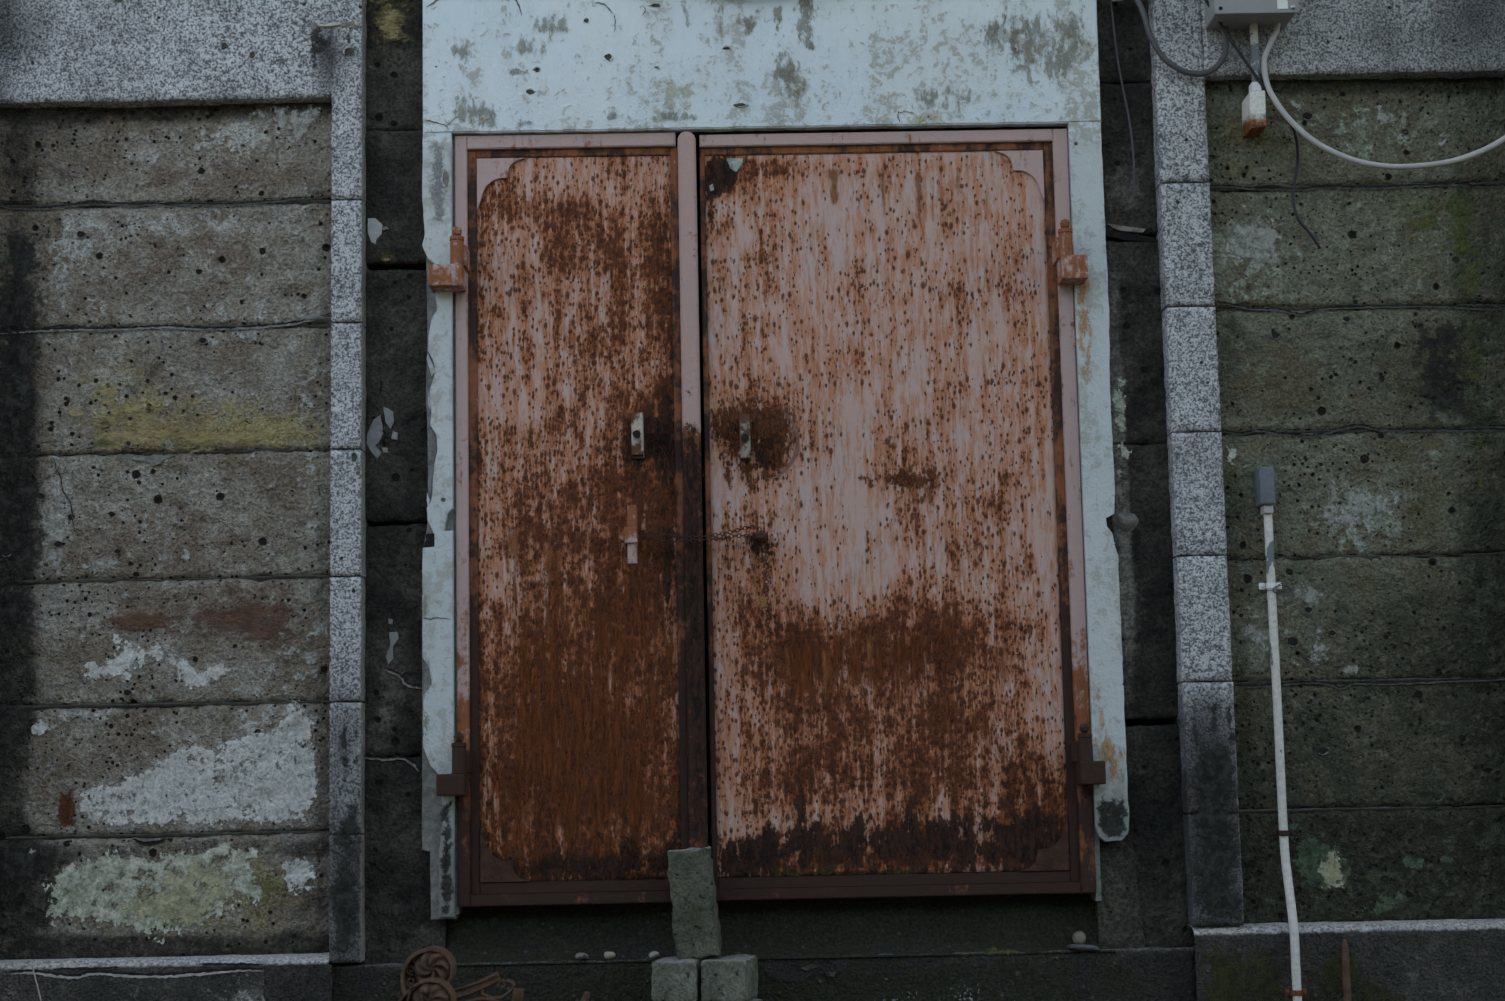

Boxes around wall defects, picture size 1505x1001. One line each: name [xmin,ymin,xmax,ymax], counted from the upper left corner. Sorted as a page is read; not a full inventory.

rust [707,157,746,240]
rust [829,170,840,204]
rust [915,172,925,231]
spalling [423,520,451,548]
rust [623,376,677,633]
rust [710,396,797,512]
rust [734,529,778,594]
rust [858,463,940,503]
water stain [79,701,320,827]
rust [710,755,1070,877]